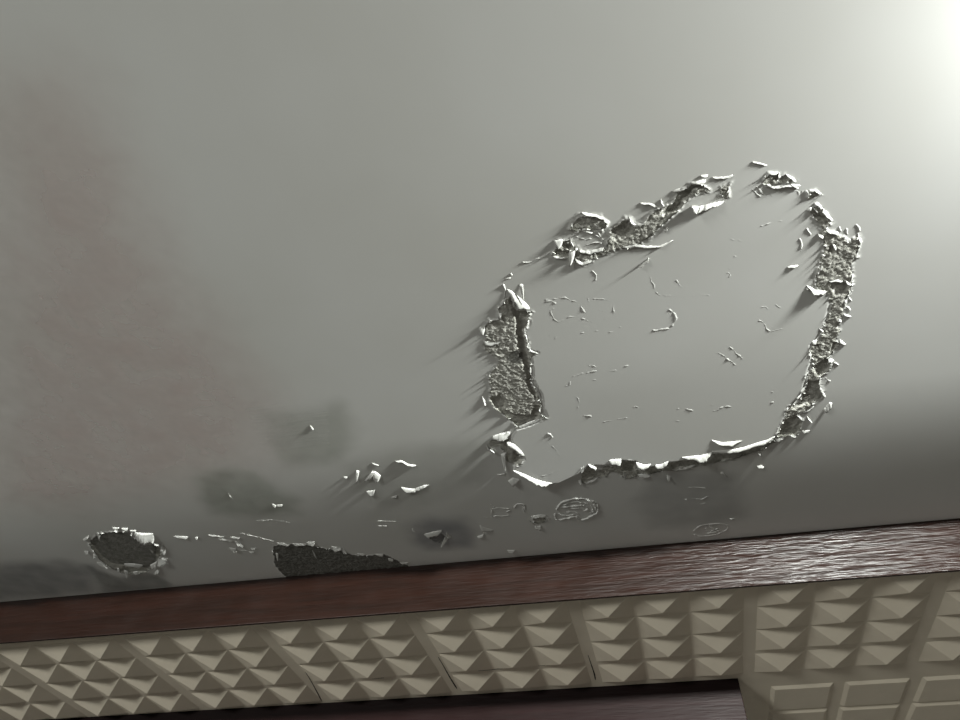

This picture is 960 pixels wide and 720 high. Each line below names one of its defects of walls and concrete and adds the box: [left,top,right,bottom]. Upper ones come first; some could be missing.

peeling [543,175,738,270]
spalling [576,162,867,486]
spalling [476,284,552,488]
peeling [343,463,381,497]
peeling [391,485,429,498]
peeling [83,527,168,578]
spalling [269,541,411,577]